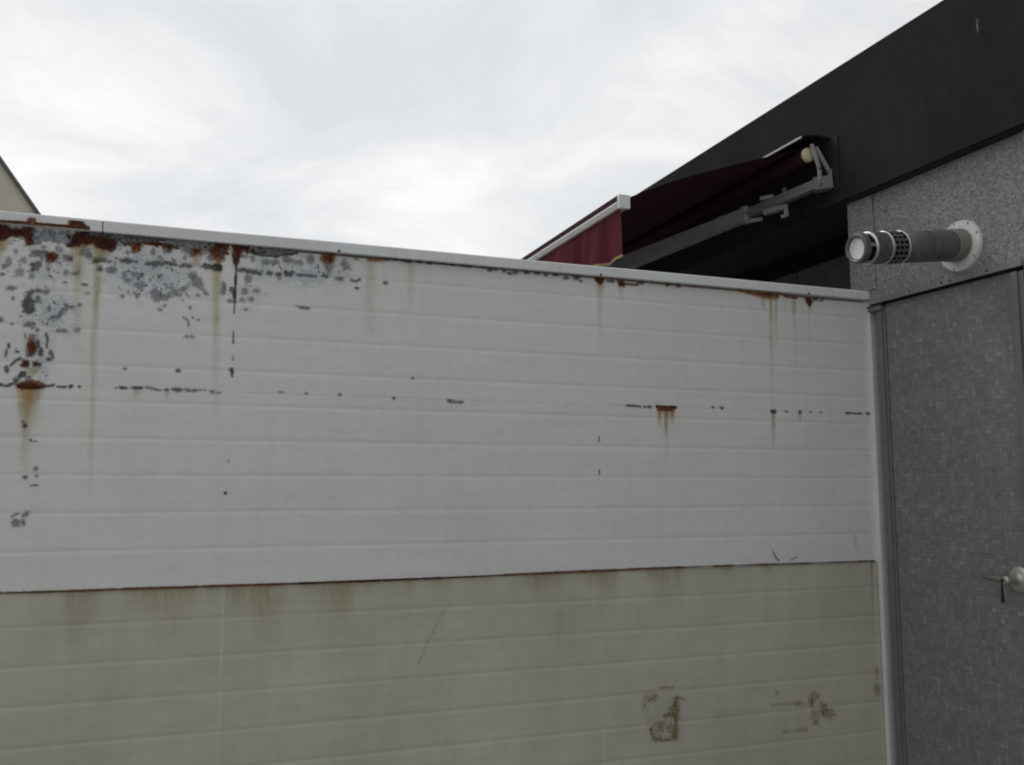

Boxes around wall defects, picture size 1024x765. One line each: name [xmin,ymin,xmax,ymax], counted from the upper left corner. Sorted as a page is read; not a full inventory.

peeling [0,230,223,388]
peeling [221,245,361,311]